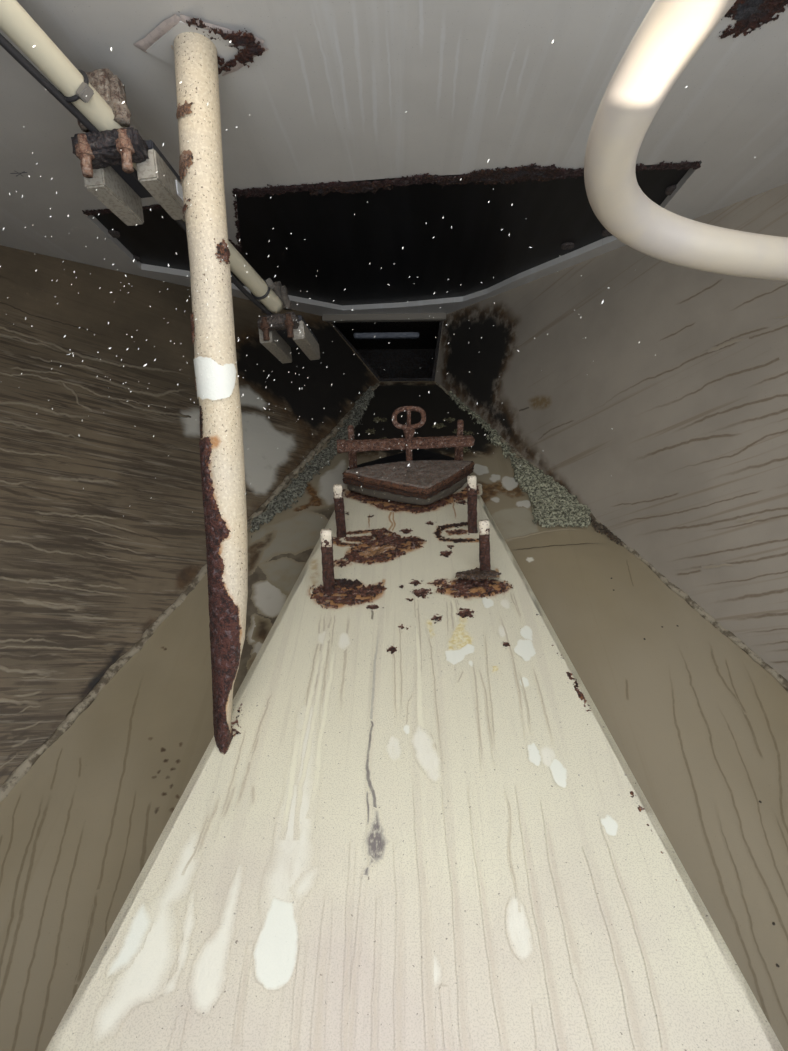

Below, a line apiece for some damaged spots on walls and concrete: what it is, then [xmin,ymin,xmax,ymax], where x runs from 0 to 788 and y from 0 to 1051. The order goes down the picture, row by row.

rust [173,405,243,755]
rust [304,480,527,621]
rust [76,615,158,701]